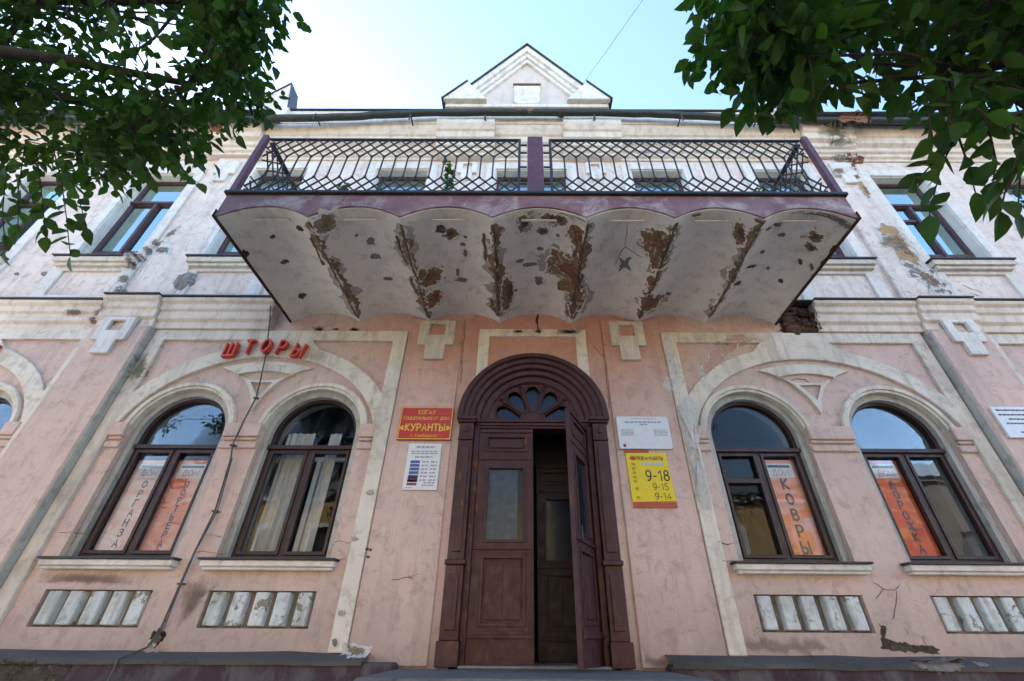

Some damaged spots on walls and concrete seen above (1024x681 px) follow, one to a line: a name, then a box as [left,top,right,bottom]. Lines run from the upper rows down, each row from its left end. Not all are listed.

peeling [296,206,363,319]
peeling [393,221,467,319]
spalling [482,209,595,319]
spalling [618,222,682,319]
spalling [870,219,957,296]
spalling [777,307,822,335]
spalling [332,638,372,659]
crack [873,582,927,646]
peeling [880,625,989,675]